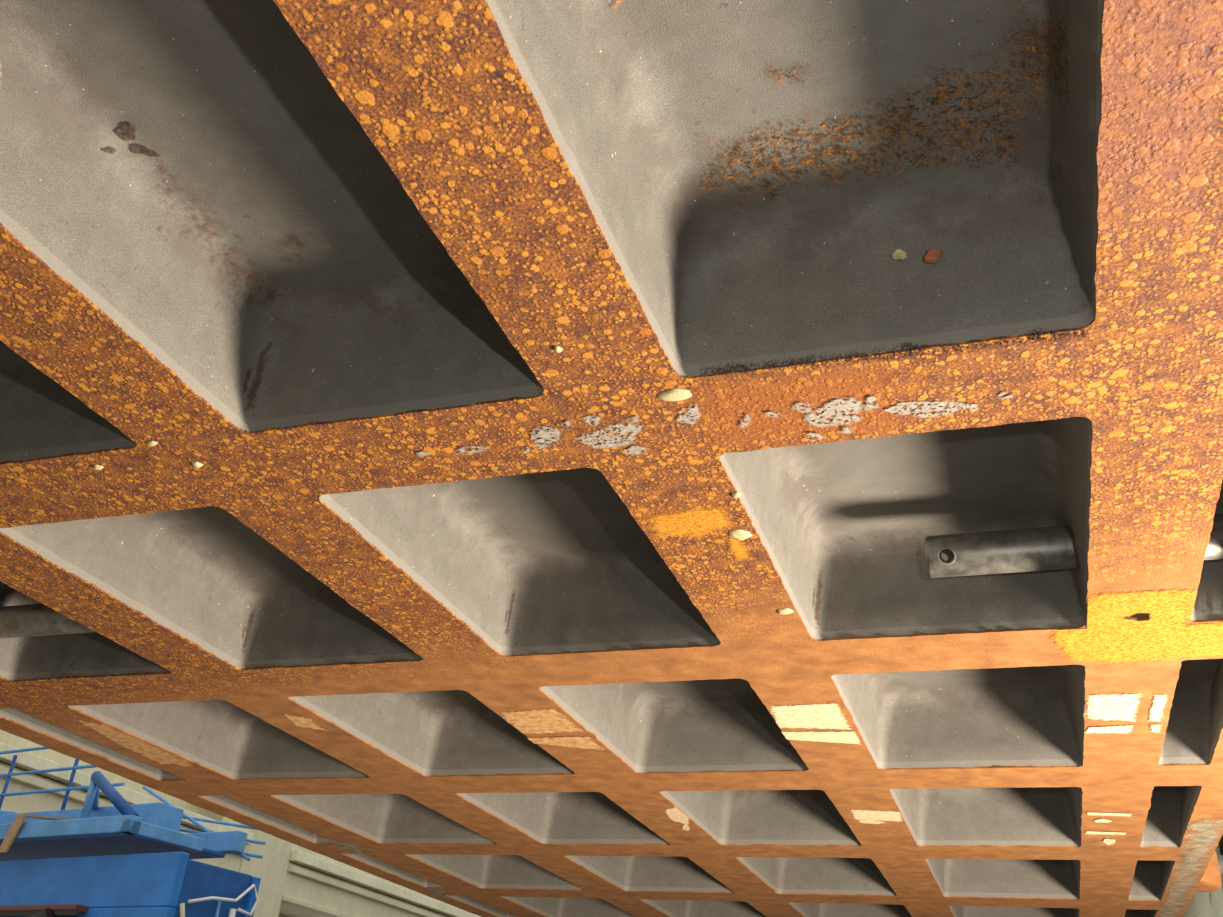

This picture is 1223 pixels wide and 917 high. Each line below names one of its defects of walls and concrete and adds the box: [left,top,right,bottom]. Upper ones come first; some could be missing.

corrosion [702,0,1068,205]
peeling [521,415,647,455]
peeling [677,404,700,424]
peeling [793,396,978,442]
corrosion [1052,590,1223,664]
peeling [1085,725,1133,734]